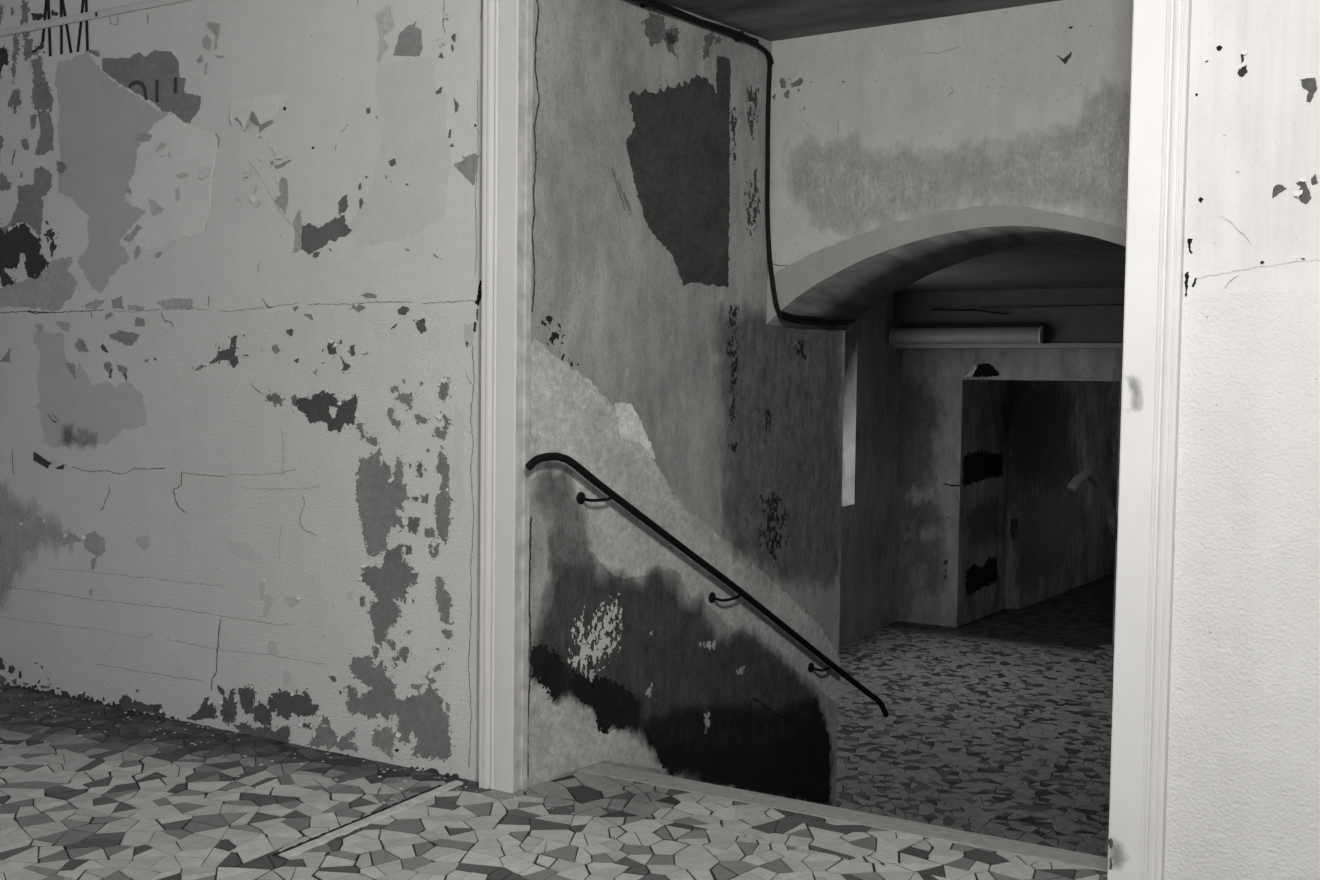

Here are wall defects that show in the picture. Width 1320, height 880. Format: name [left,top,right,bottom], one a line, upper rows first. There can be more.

peeling [641,10,681,59]
peeling [1237,51,1248,77]
peeling [1301,78,1317,102]
flaking render [0,0,193,469]
peeling [270,160,368,258]
peeling [626,30,731,288]
leakage [792,89,1130,227]
peeling [1272,174,1318,204]
peeling [192,329,293,373]
peeling [391,306,427,334]
peeling [187,338,455,762]
leakage [528,468,832,805]